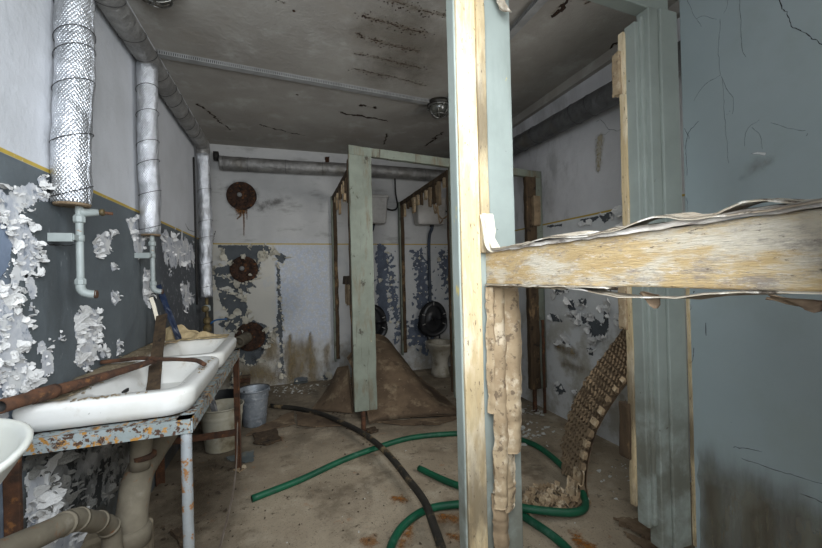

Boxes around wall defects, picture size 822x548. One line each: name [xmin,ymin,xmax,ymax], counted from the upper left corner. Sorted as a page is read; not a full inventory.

crack [348,0,446,86]
crack [779,0,822,45]
crack [340,104,388,144]
peeling [0,174,124,399]
peeling [126,214,157,309]
peeling [160,227,195,276]
peeling [180,280,195,313]
peeling [212,243,333,397]
damp [242,333,316,383]
peeling [374,243,449,356]
peeling [22,441,131,528]
damp [702,464,822,548]